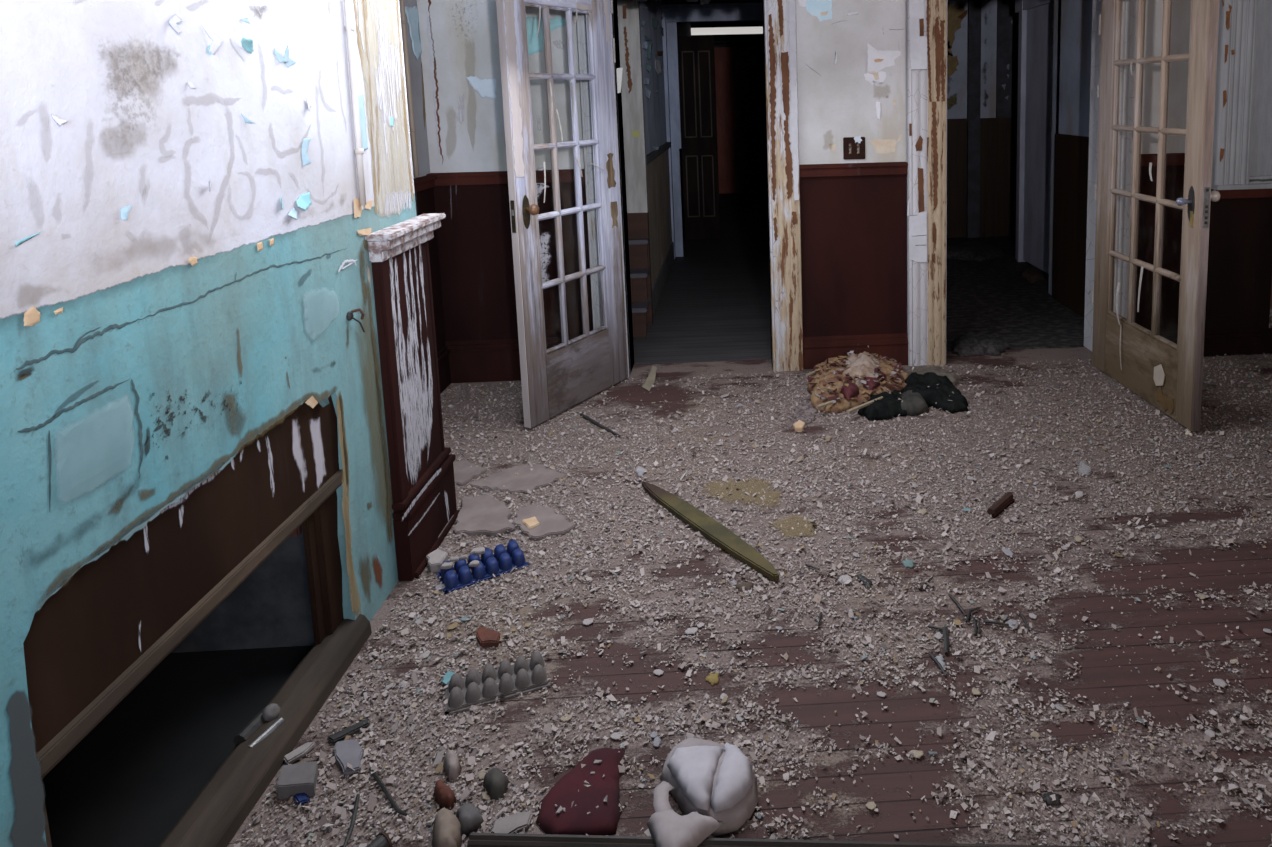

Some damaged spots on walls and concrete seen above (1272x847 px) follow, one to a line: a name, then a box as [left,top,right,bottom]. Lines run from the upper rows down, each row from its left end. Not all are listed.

peeling [201,25,254,61]
peeling [274,45,296,68]
peeling [768,0,832,225]
peeling [864,0,968,263]
peeling [281,192,312,219]
crack [16,247,348,370]
flaking render [37,388,336,610]